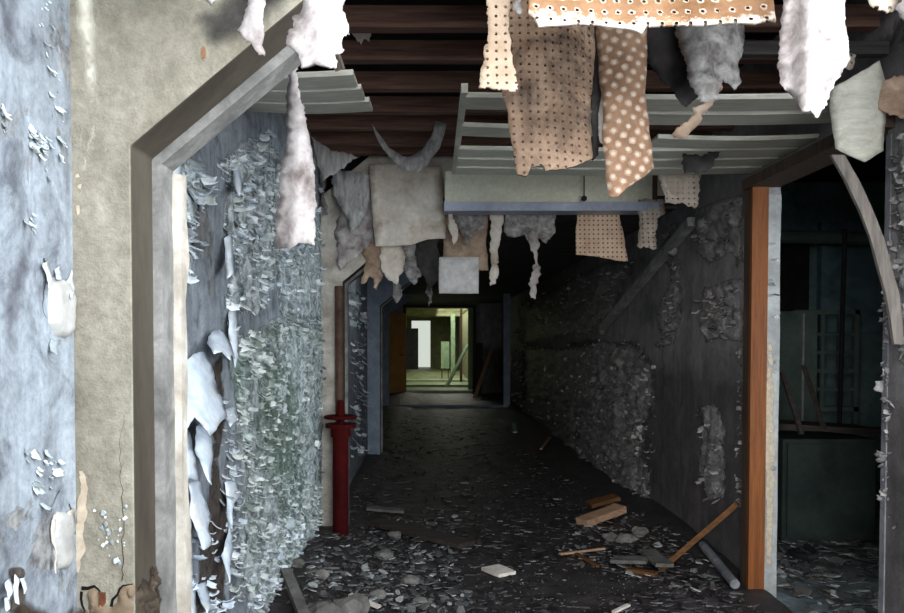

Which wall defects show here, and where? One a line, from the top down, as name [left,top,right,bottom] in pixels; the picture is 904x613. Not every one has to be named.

peeling [181,127,328,613]
peeling [516,261,656,498]
peeling [654,248,744,508]
peeling [874,133,904,508]
spalling [87,567,162,613]